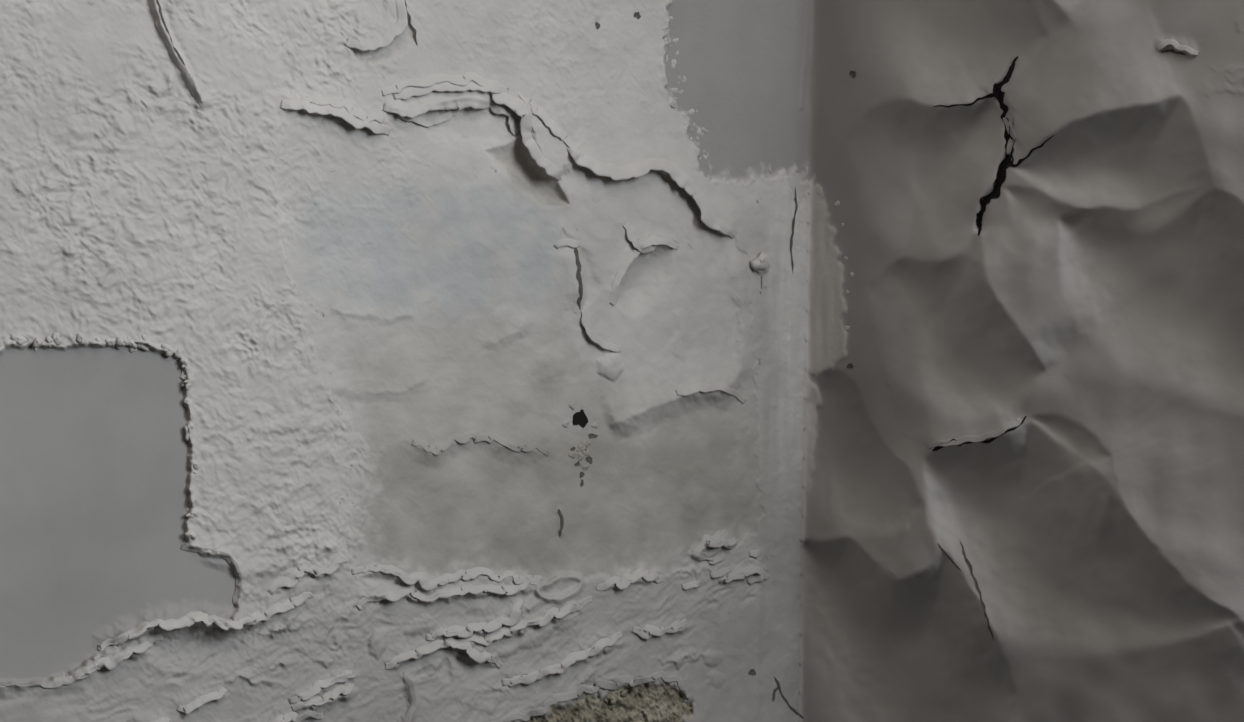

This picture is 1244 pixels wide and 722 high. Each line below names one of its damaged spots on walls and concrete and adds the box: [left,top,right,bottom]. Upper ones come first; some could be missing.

peeling [280,0,813,239]
crack [933,56,1054,236]
peeling [1156,39,1198,55]
crack [927,416,1026,451]
peeling [0,332,770,722]